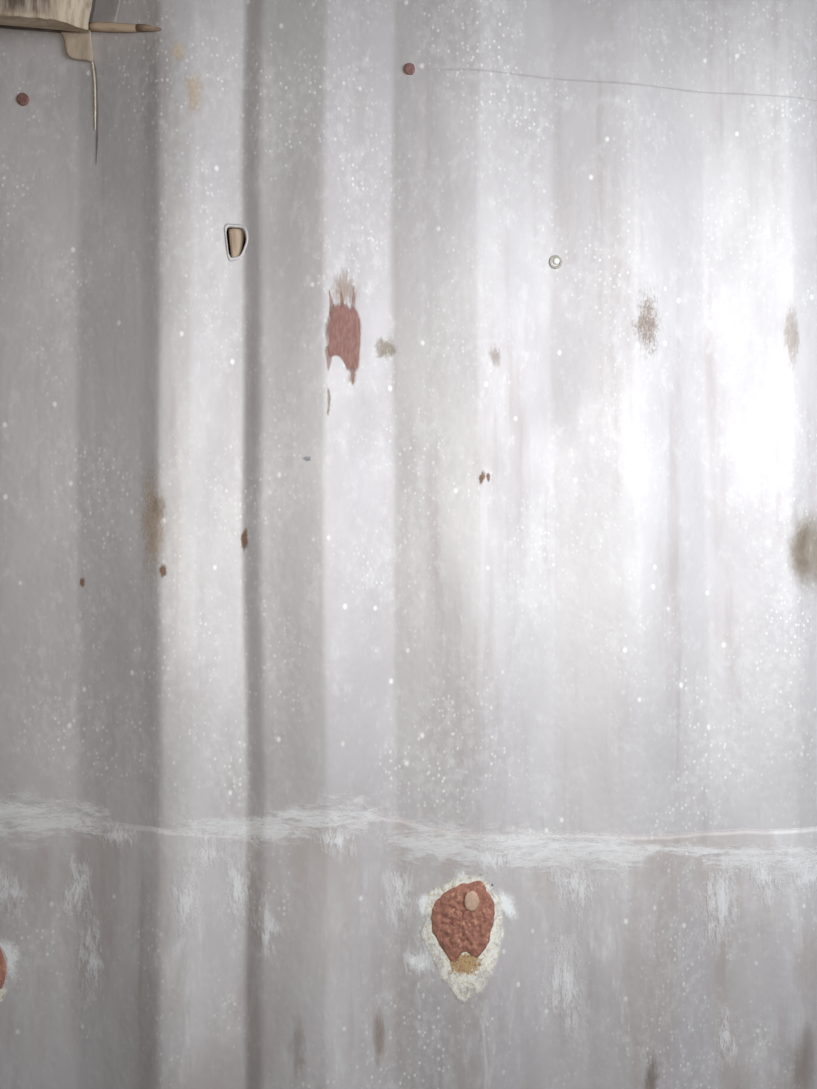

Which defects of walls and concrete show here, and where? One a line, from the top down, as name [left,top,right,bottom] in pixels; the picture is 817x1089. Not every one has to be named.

rust [326,304,360,371]
damp [0,795,134,845]
rust [407,871,516,1001]
rust [0,941,20,1002]